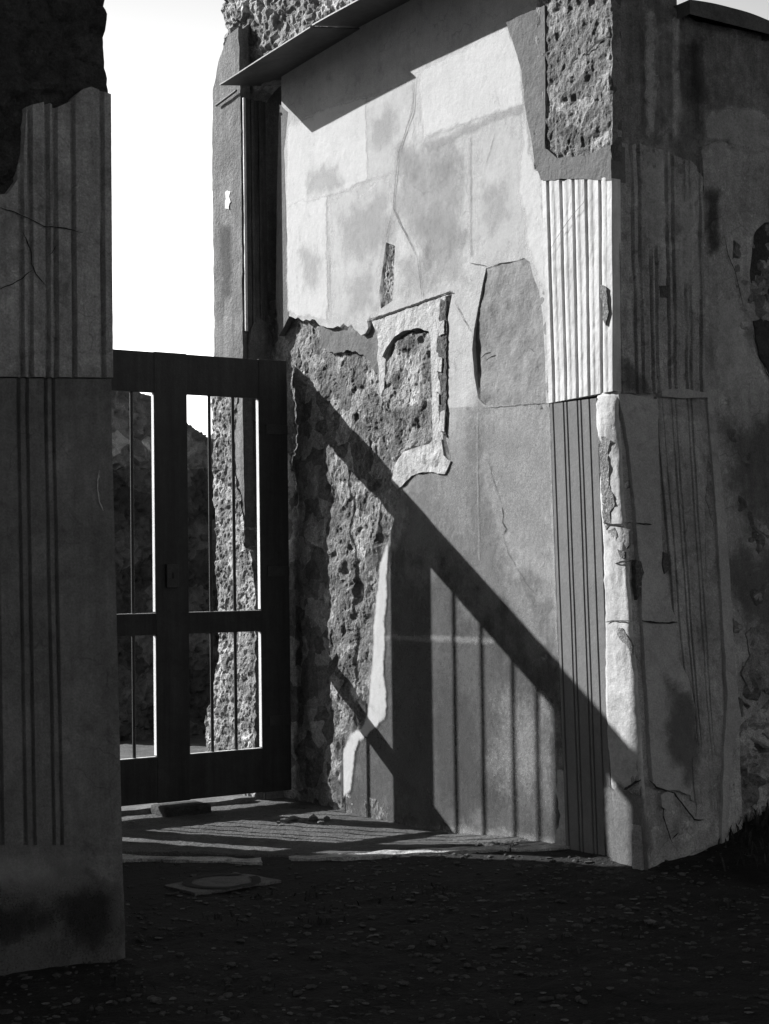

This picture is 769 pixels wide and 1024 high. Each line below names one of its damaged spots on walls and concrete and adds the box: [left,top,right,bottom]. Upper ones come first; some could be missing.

crack [0,208,82,289]
spalling [381,243,395,308]
spalling [435,299,449,438]
spalling [753,318,769,374]
peeling [740,625,769,693]
spalling [346,794,390,821]
crack [609,779,703,842]